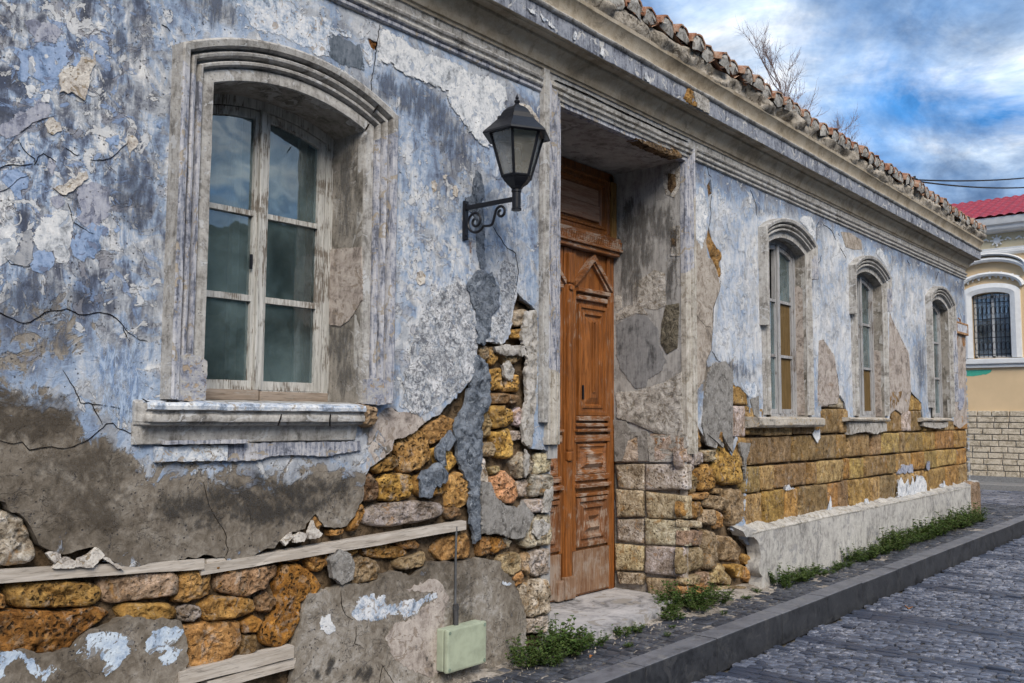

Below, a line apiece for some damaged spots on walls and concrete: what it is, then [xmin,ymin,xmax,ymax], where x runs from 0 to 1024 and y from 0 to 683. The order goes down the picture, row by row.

peeling [0,19,97,139]
peeling [235,0,507,147]
crack [0,116,126,191]
peeling [0,158,120,274]
crack [0,308,146,341]
leakage [0,387,74,440]
crack [0,371,189,450]
leakage [37,447,133,531]
leakage [155,471,349,529]
flaking render [0,261,554,668]
flaking render [615,382,967,602]
flaking render [242,670,288,683]